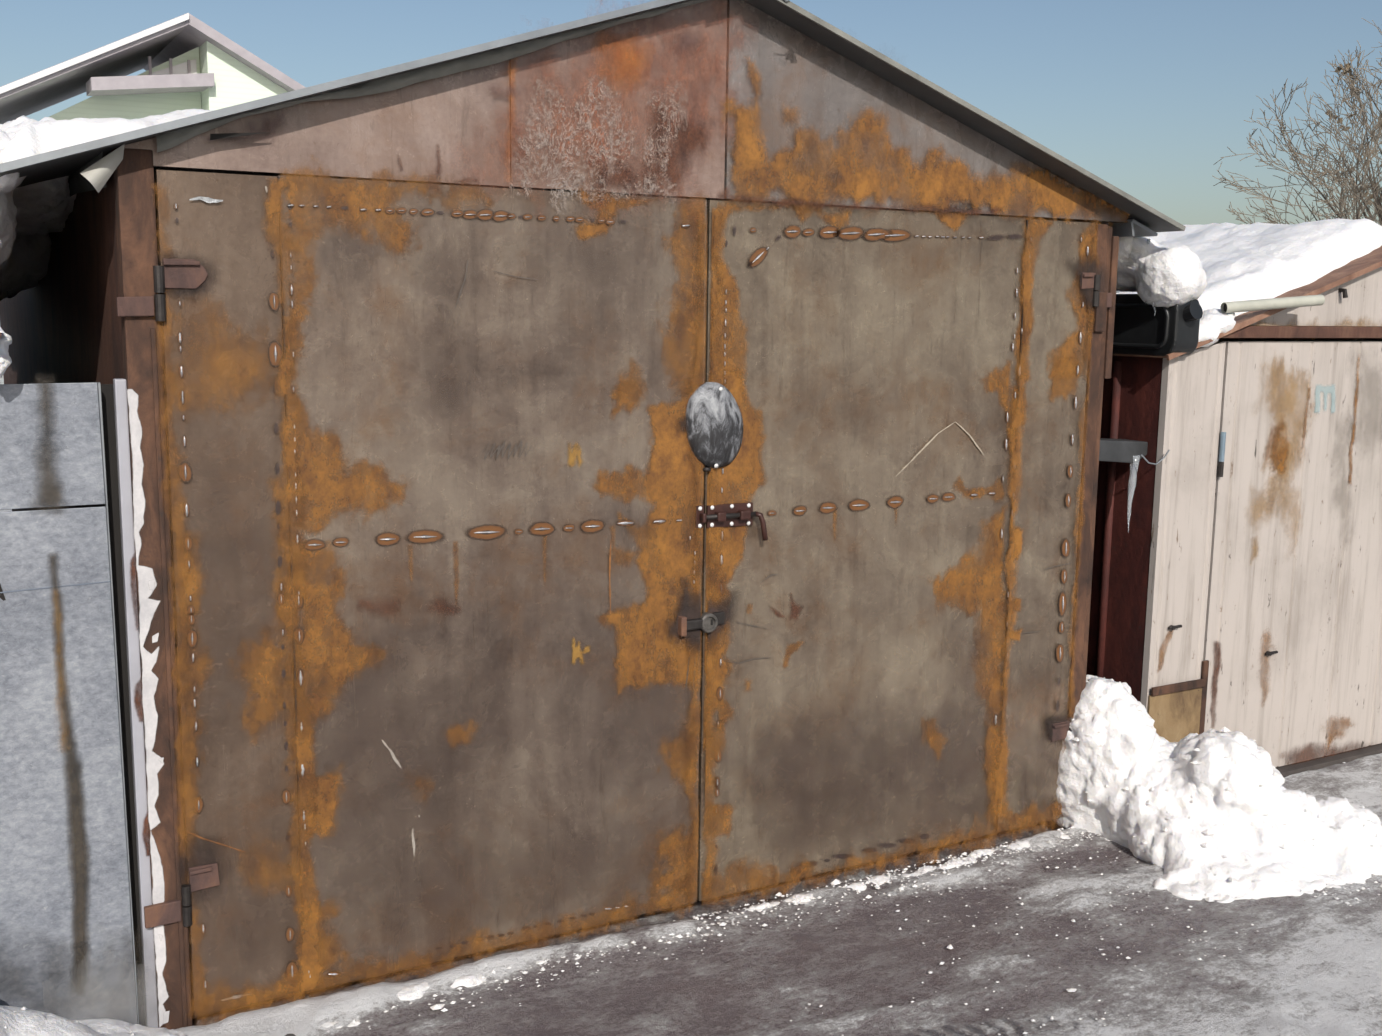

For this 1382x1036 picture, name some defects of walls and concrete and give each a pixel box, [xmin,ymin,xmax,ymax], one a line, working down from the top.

leakage [50,555,88,994]
rust [162,373,207,858]
rust [191,61,1129,1021]
rust [1266,364,1310,481]